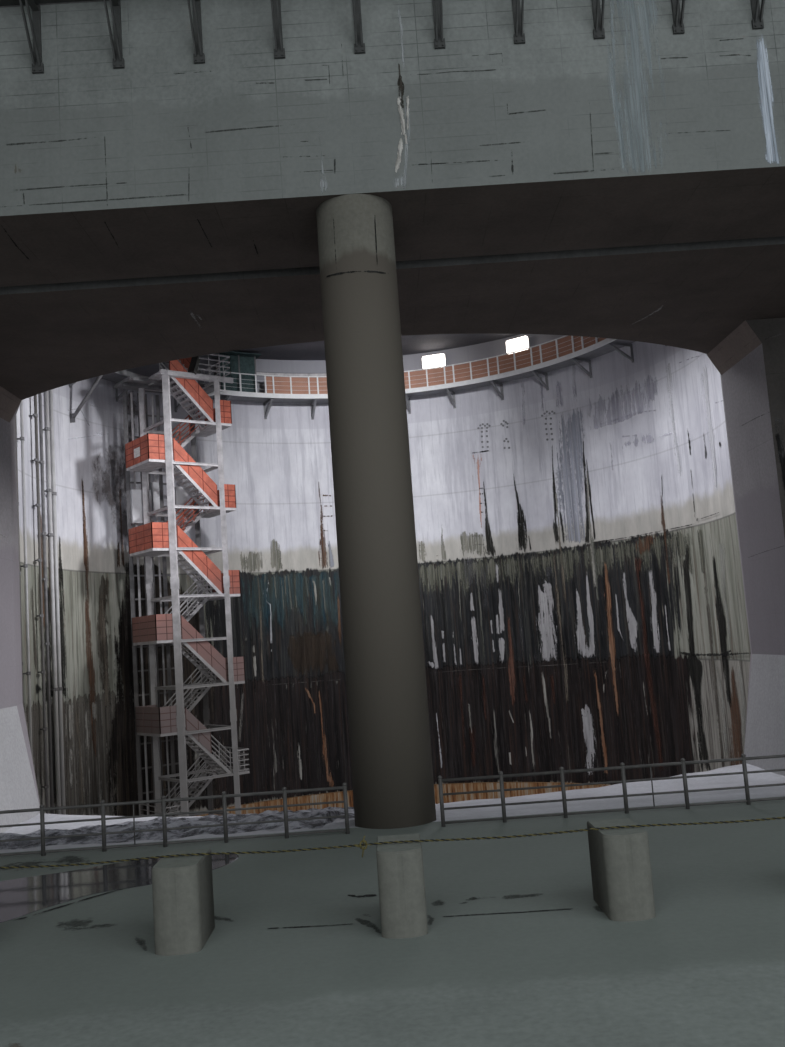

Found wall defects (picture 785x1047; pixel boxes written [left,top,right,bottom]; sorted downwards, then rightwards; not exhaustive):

leakage [757,37,781,164]
leakage [419,527,521,672]
corrosion [508,618,517,704]
leakage [536,409,607,737]
corrosion [604,562,619,716]
leakage [615,571,638,653]
leakage [649,557,680,652]
leakage [697,530,728,767]
corrosion [305,688,334,787]
leakage [581,704,596,775]
corrosion [593,670,608,775]